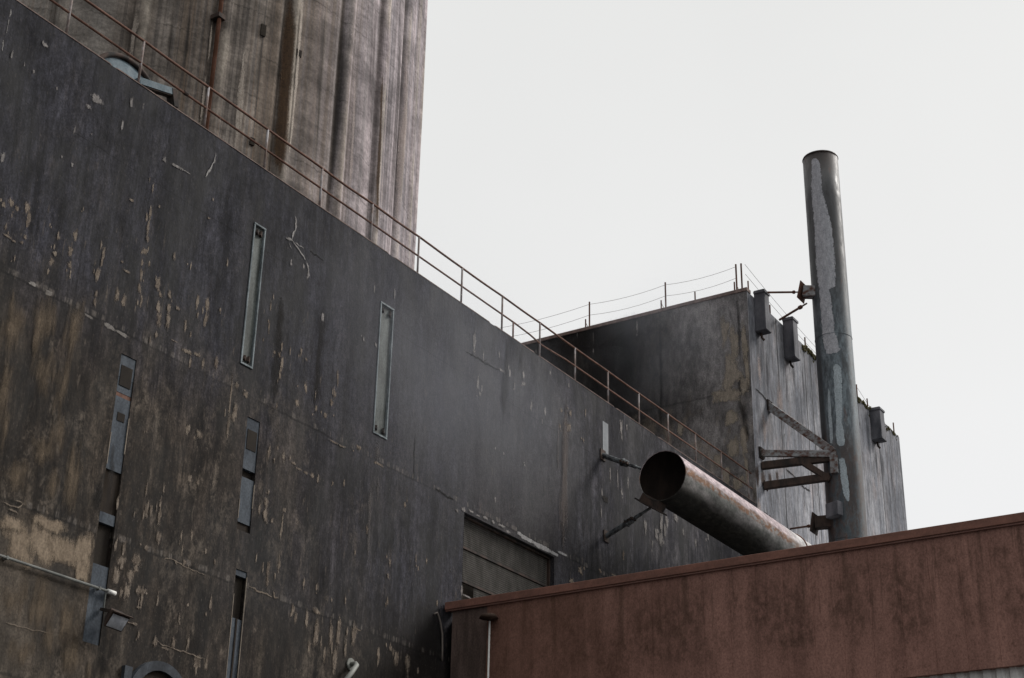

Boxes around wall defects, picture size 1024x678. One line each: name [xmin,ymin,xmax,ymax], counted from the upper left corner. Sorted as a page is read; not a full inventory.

peeling [0,198,31,244]
peeling [47,225,77,278]
crack [287,216,324,278]
peeling [29,281,55,347]
peeling [65,240,105,351]
peeling [811,158,850,501]
peeling [225,375,248,438]
peeling [113,482,165,609]
peeling [258,490,286,537]
spalling [456,507,567,556]
peeling [154,636,208,675]
spalling [291,605,361,675]